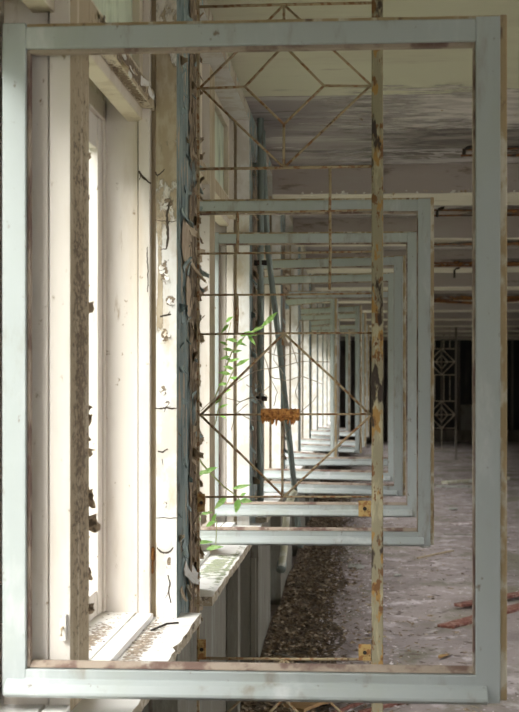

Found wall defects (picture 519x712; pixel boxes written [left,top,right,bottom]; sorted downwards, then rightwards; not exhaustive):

peeling [105,54,155,109]
water stain [383,128,472,159]
spalling [159,260,169,284]
peeling [166,53,210,621]
peeling [71,117,101,634]